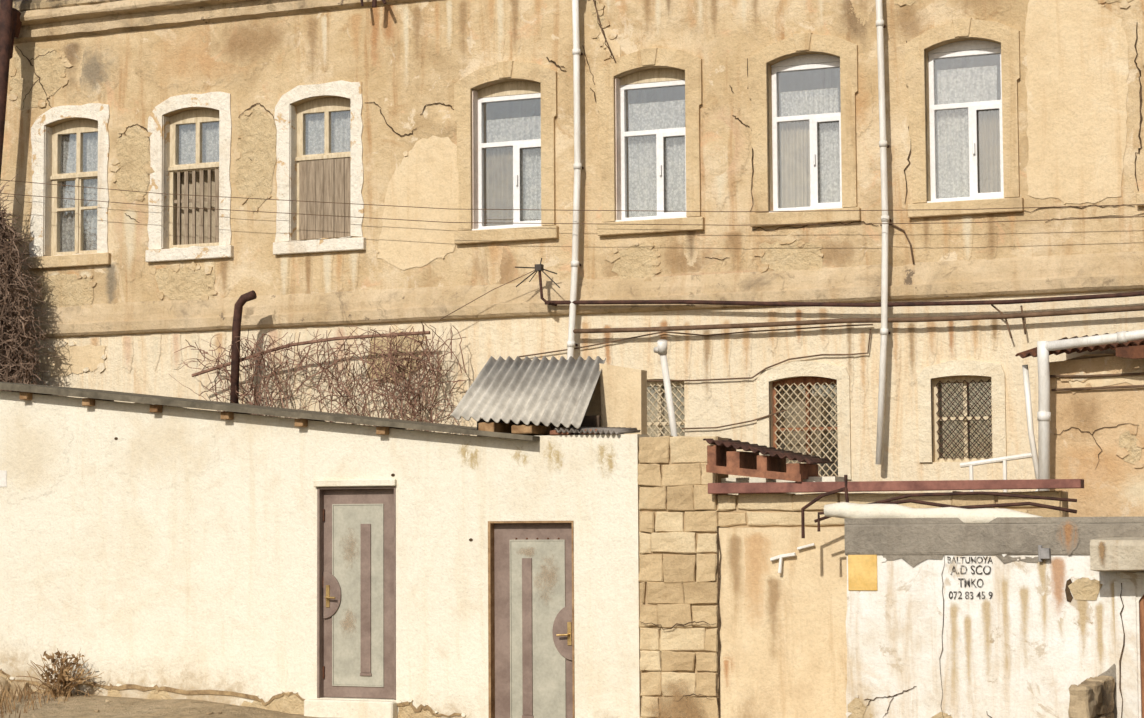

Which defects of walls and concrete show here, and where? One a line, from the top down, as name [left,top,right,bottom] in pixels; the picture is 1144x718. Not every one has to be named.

water stain [402,0,471,91]
water stain [486,0,544,62]
crack [16,46,54,108]
crack [366,102,454,137]
peeling [1024,0,1144,204]
crack [1024,25,1144,222]
crack [1057,423,1134,469]
water stain [905,568,1119,718]
flaking render [0,668,55,693]
flaking render [72,680,305,715]
flaking render [396,699,466,718]
water stain [854,678,880,718]